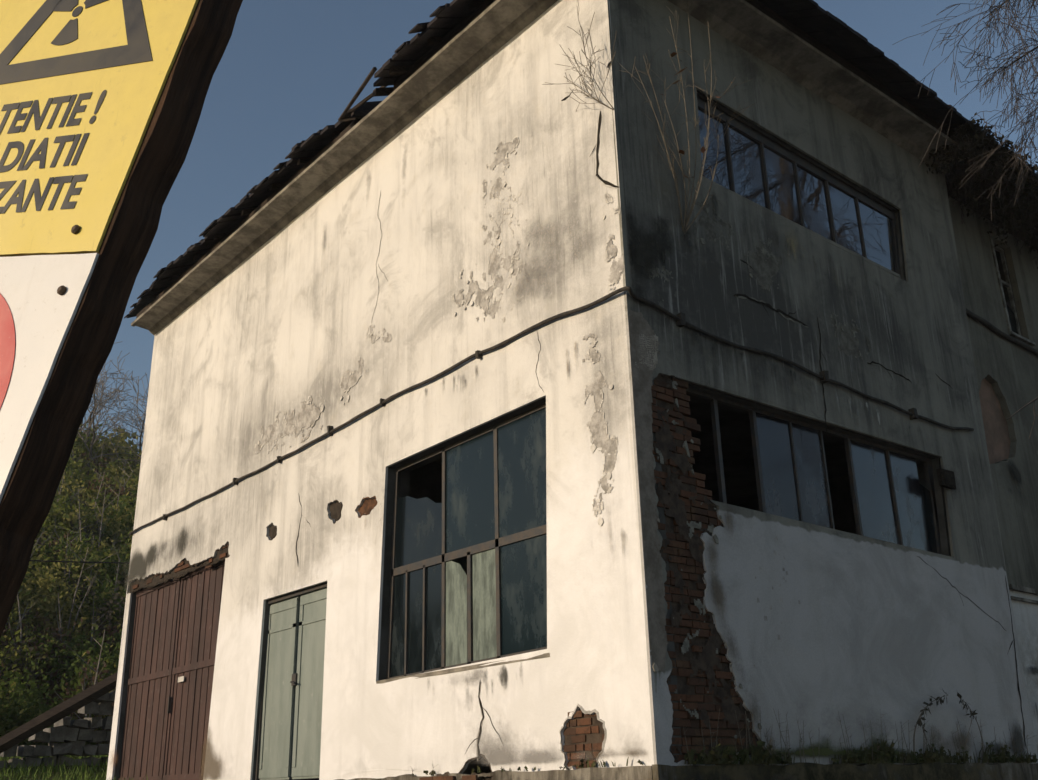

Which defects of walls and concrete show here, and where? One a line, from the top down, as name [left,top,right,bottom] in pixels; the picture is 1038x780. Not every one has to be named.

peeling [451,136,534,322]
peeling [582,333,618,526]
crack [734,294,828,436]
spalling [266,523,277,540]
spalling [327,496,378,524]
flaking render [628,310,764,767]
flaking render [419,754,493,780]
crack [468,682,504,761]
flaking render [559,704,607,770]
crack [917,556,1026,747]